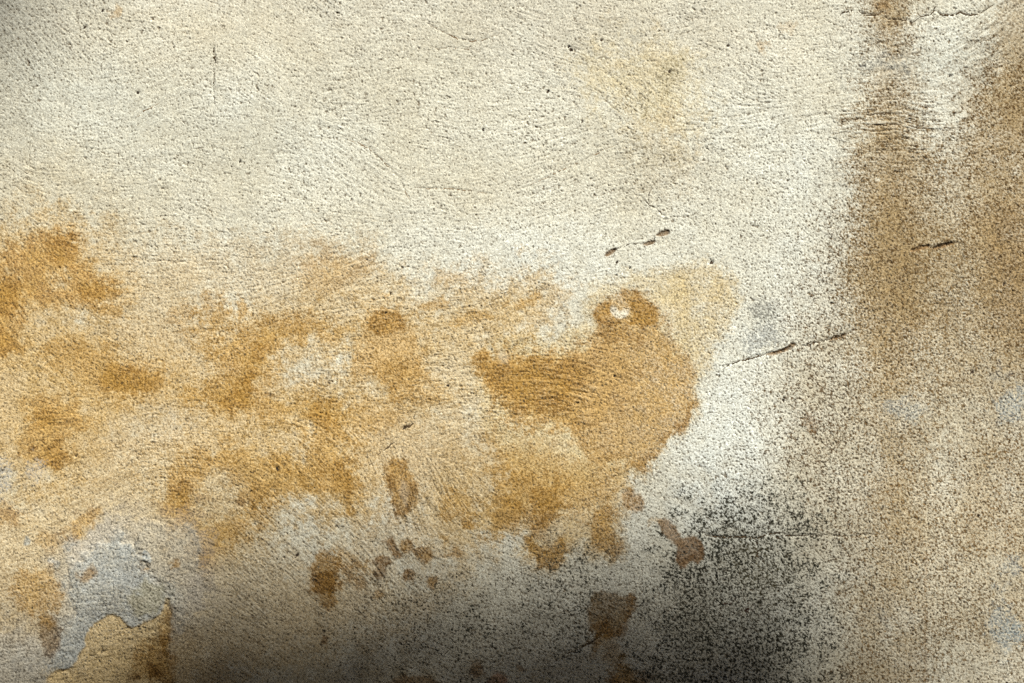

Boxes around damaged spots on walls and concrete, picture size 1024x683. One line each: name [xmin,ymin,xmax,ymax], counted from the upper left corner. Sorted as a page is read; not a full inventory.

crack [604,190,671,258]
damp [0,169,866,683]
crack [723,332,851,367]
peeling [0,473,249,683]